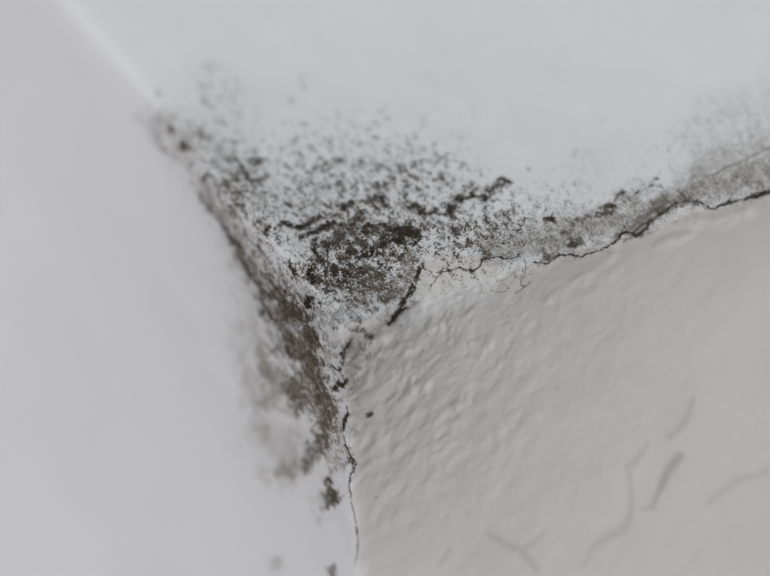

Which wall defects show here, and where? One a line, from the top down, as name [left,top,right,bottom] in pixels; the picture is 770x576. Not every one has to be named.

damp [151,109,770,512]
crack [385,148,770,325]
crack [343,406,359,566]